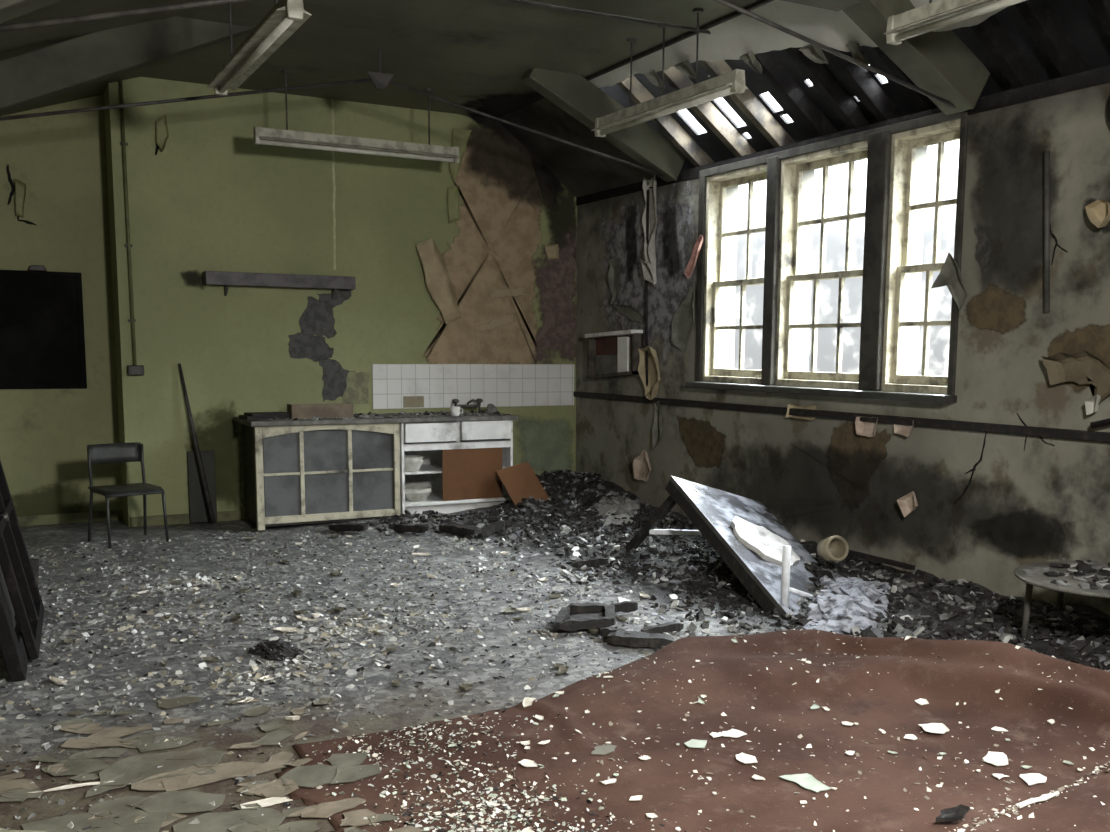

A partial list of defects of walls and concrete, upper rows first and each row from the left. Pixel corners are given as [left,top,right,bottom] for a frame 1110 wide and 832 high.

peeling [416,123,559,364]
flaking render [288,290,370,404]
flaking render [600,175,703,482]
flaking render [1042,324,1110,415]
flaking render [786,404,818,421]
flaking render [677,416,726,468]
flaking render [829,416,914,463]
crack [965,432,987,485]
flaking render [897,491,918,518]